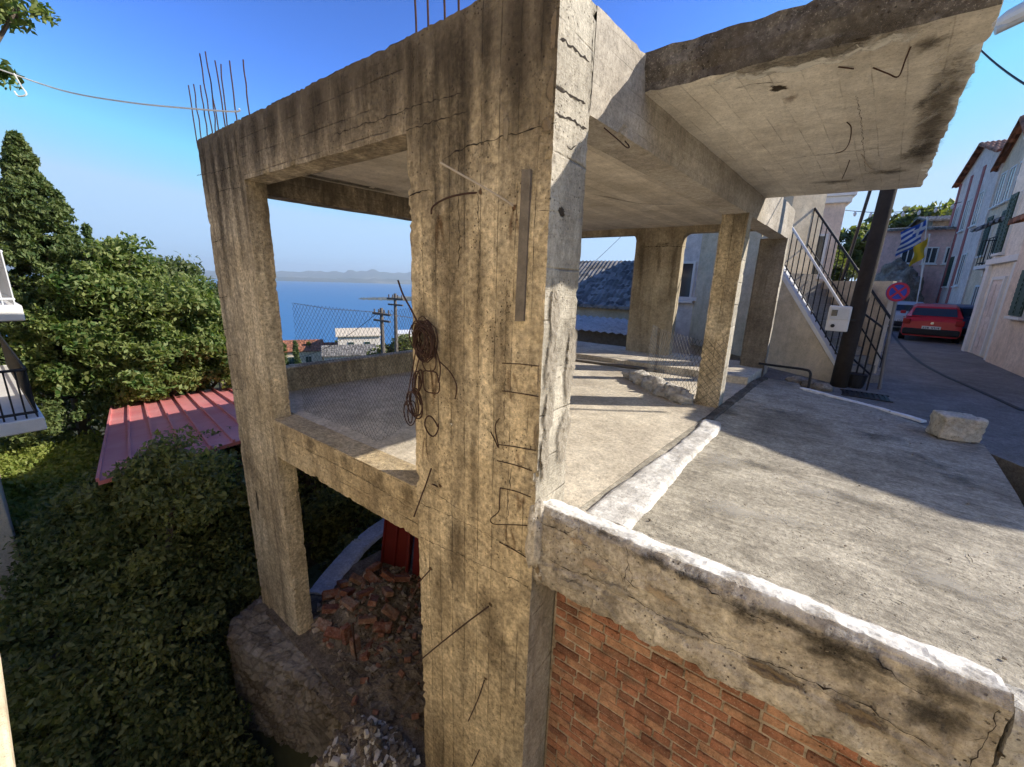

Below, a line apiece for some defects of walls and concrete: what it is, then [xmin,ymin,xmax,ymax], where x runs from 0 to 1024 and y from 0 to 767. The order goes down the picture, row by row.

water stain [880,64,963,174]
crack [444,12,595,302]
water stain [731,601,888,676]
water stain [907,676,972,732]
crack [969,710,999,767]